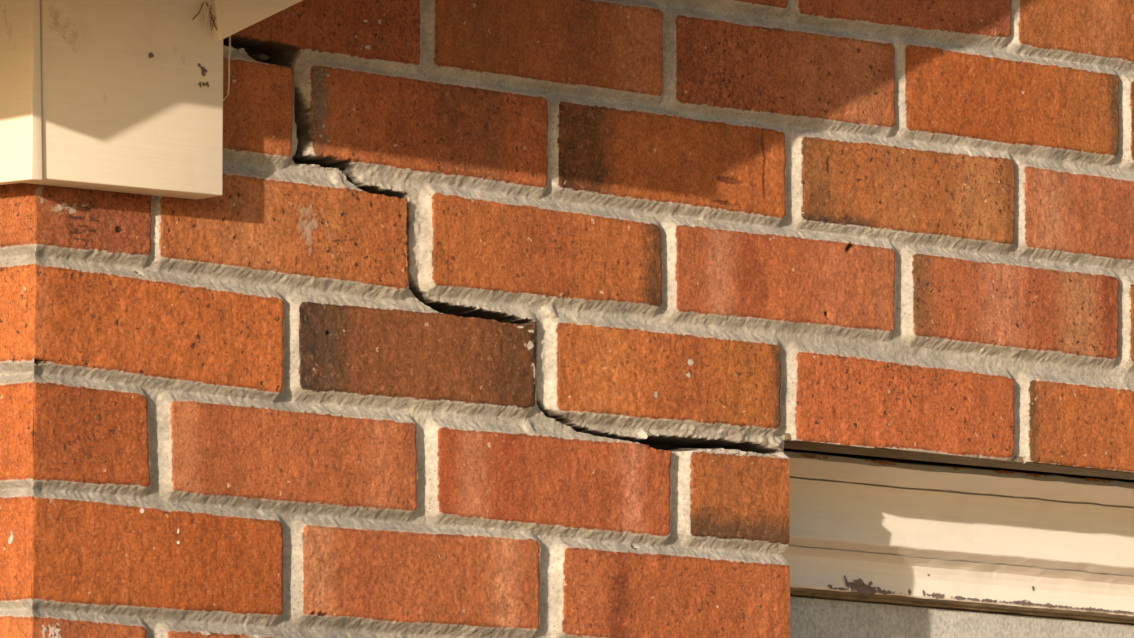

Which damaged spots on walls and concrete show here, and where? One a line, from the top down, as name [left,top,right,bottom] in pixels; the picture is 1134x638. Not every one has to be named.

crack [223,31,790,461]
peeling [828,575,894,596]
peeling [908,586,1134,614]